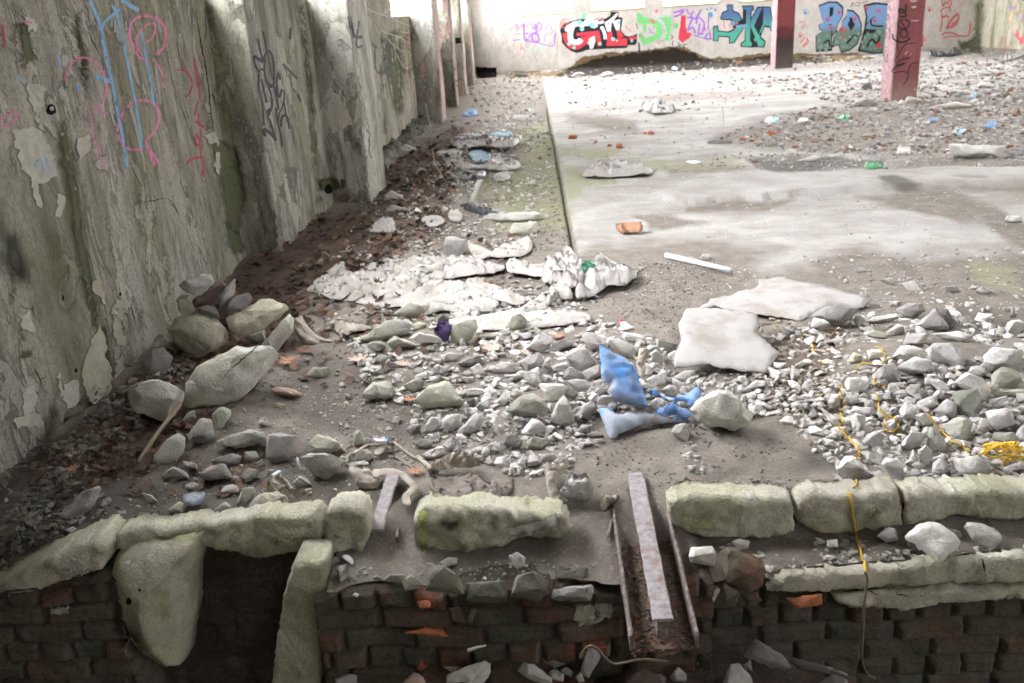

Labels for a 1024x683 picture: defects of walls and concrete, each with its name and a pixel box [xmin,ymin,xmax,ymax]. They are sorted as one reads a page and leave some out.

flaking render [10,127,57,208]
damp [213,141,247,254]
flaking render [17,308,35,332]
flaking render [55,280,126,409]
flaking render [11,384,44,429]